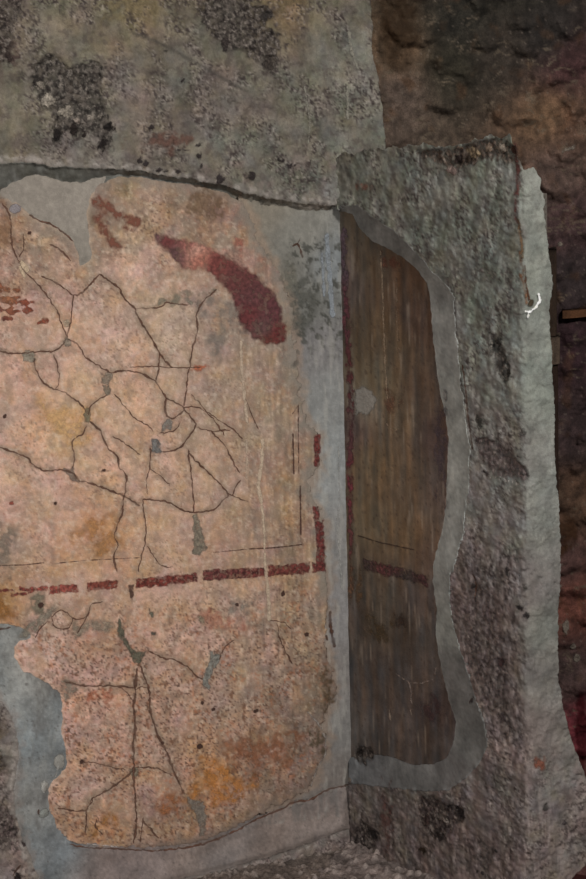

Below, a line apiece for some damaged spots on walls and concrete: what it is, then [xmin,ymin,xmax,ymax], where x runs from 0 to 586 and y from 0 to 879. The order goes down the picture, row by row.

spalling [417,139,518,175]
rust [514,143,530,304]
flaking render [487,327,512,383]
crack [0,203,259,572]
flaking render [475,414,528,486]
crack [35,601,103,638]
crack [270,620,292,664]
crack [38,650,348,852]
flaking render [0,808,26,851]
flaking render [418,796,465,842]